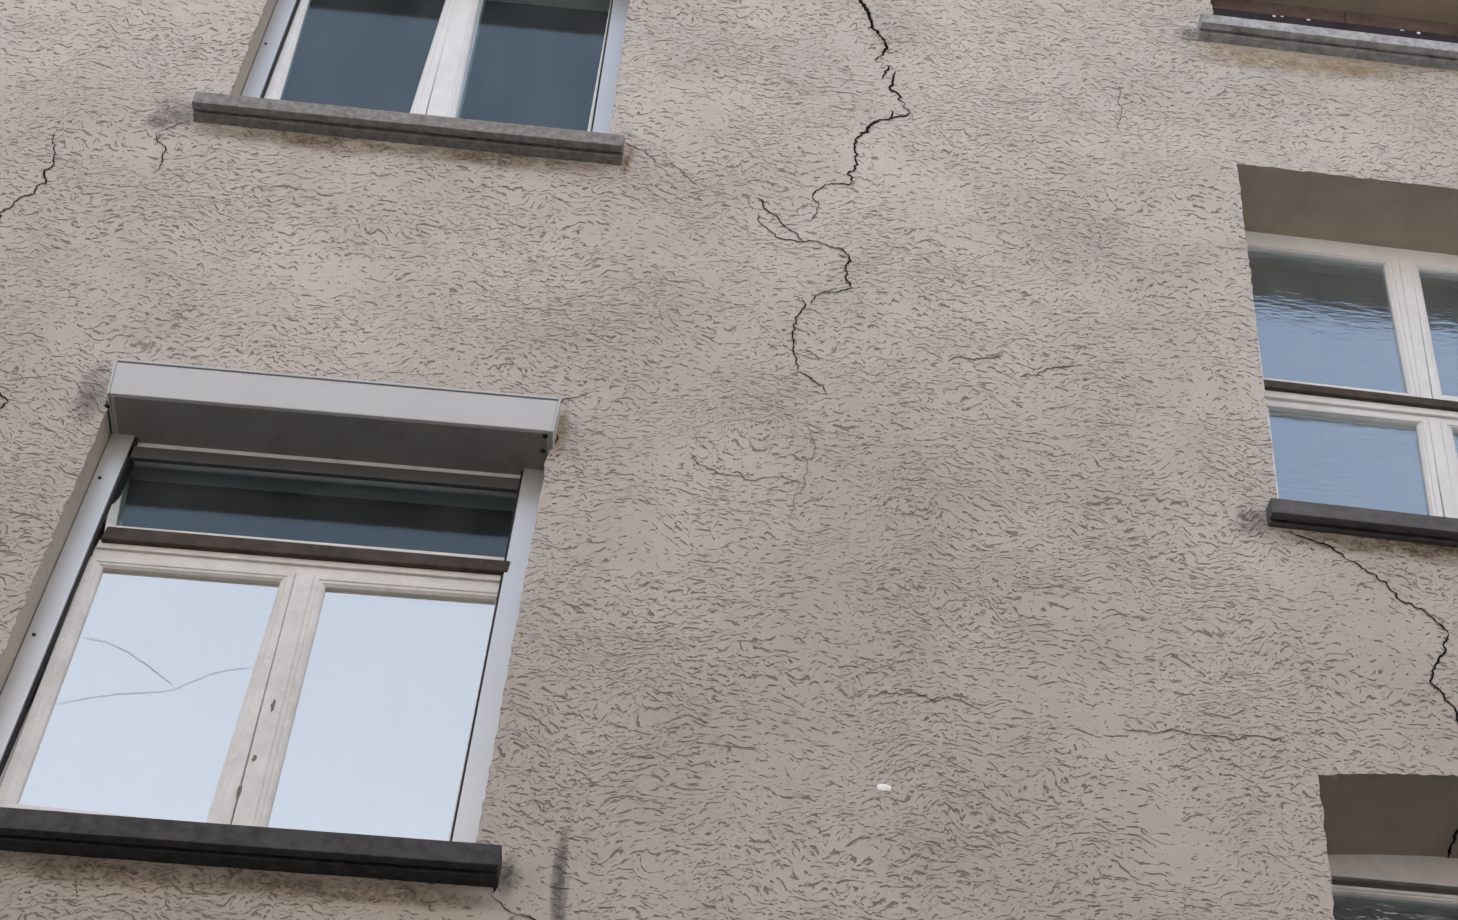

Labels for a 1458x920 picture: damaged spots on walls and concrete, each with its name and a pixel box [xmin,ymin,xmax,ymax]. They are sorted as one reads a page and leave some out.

crack [0,134,56,218]
crack [756,0,911,394]
crack [791,432,861,521]
crack [1290,531,1458,723]
crack [1447,829,1458,859]